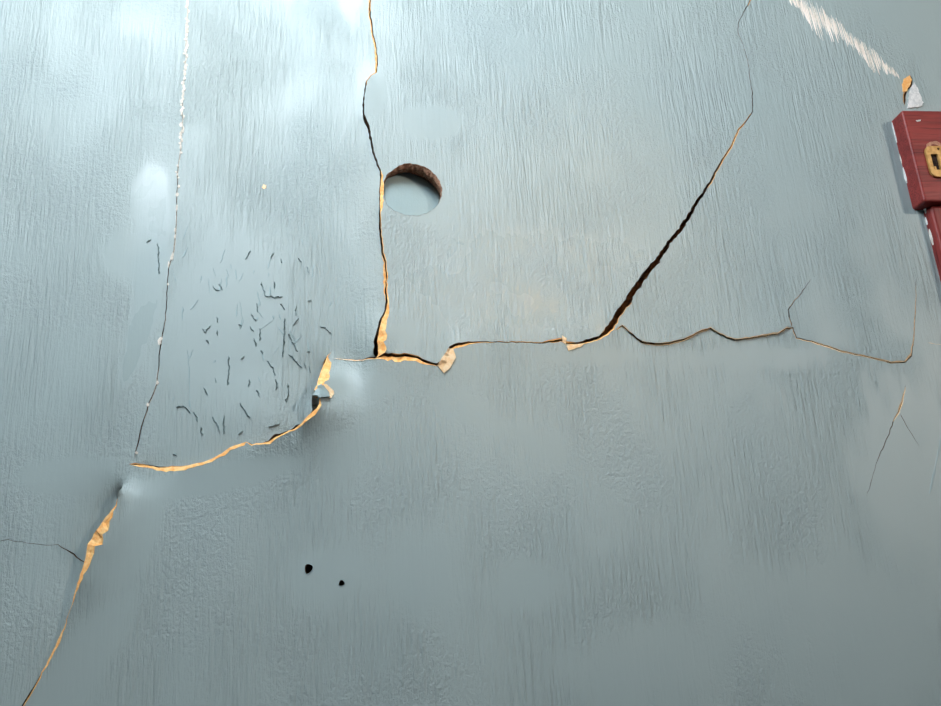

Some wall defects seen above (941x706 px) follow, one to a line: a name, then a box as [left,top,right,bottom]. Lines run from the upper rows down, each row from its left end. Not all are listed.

peeling [789,0,924,108]
crack [130,0,941,493]
crack [1,497,118,706]